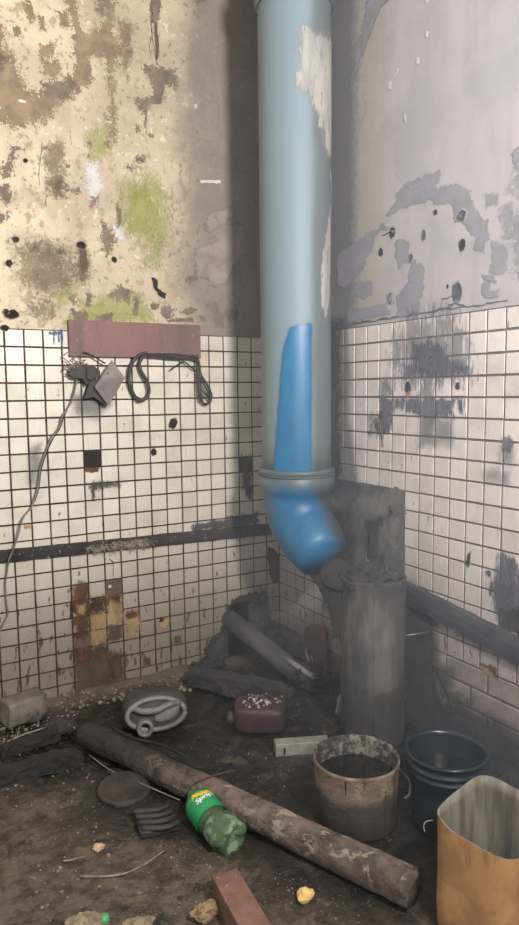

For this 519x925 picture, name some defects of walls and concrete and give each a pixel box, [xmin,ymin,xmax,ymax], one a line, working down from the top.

peeling [350,0,385,128]
peeling [336,147,519,323]
water stain [10,241,91,320]
water stain [403,336,473,380]
water stain [369,395,465,435]
peeling [84,450,101,482]
corrosion [68,581,140,646]
water stain [491,581,519,636]